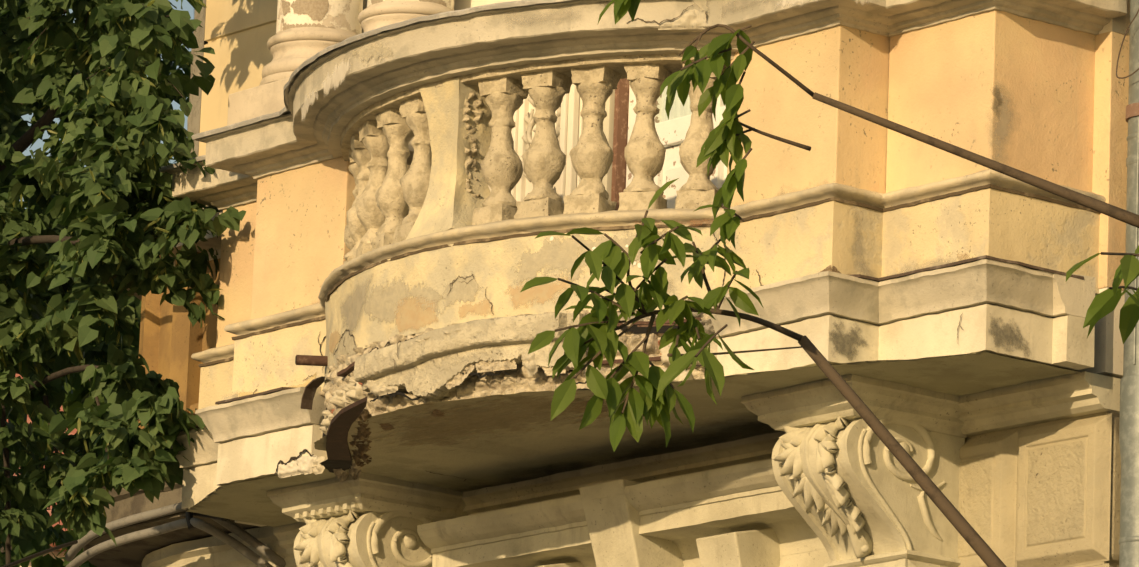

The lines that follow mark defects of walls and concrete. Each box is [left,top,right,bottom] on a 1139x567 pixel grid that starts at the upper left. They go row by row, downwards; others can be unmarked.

peeling [281,0,335,31]
crack [627,5,708,24]
water stain [990,88,1011,144]
peeling [510,231,644,306]
peeling [341,276,491,345]
spalling [446,348,584,389]
spalling [593,292,718,390]
water stain [830,323,867,360]
water stain [989,318,1029,354]
spalling [278,362,407,483]